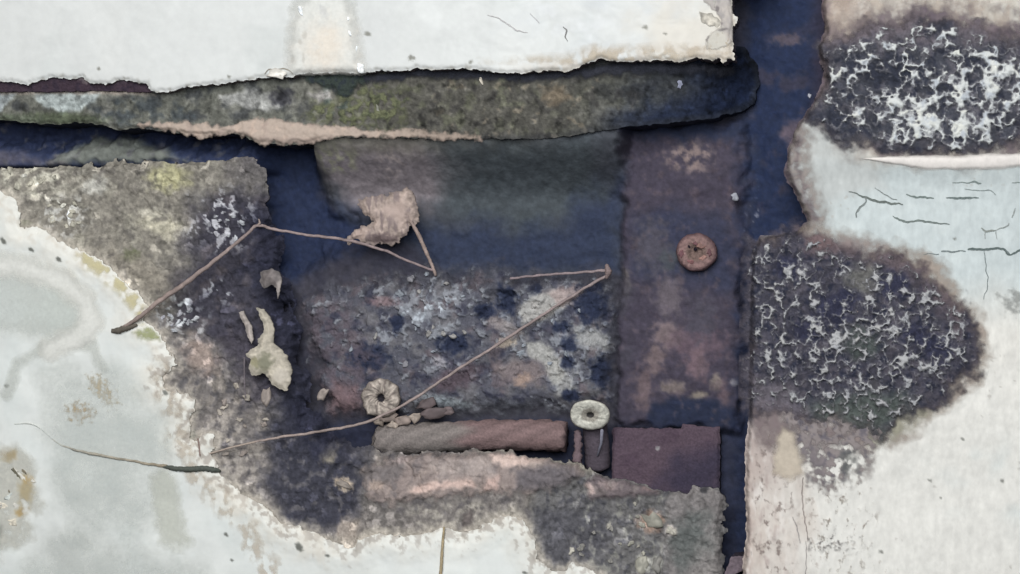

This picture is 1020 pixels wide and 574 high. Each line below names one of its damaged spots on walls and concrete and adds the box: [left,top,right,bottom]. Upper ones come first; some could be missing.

peeling [266,68,287,79]
peeling [137,118,482,146]
damp [738,0,1020,503]
crack [849,181,1020,299]
spalling [0,156,729,574]